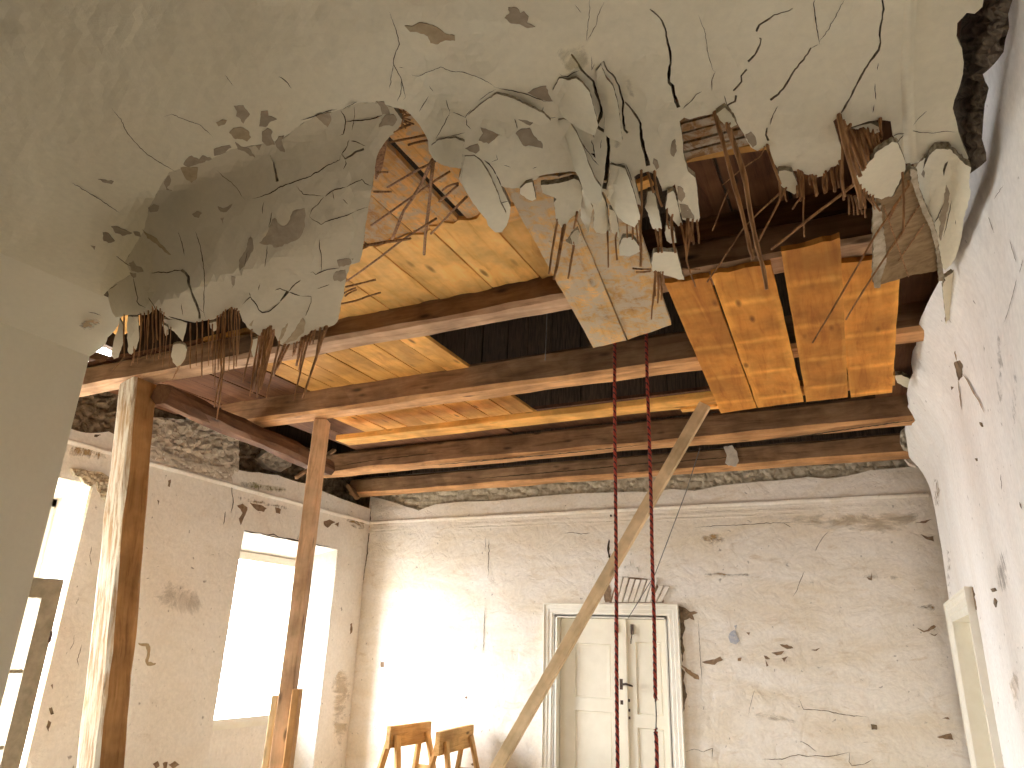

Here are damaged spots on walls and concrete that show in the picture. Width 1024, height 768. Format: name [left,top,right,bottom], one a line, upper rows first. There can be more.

crack [812,1,844,48]
crack [561,0,648,181]
crack [665,15,729,107]
flaking render [953,0,1012,173]
crack [116,114,176,172]
crack [220,14,555,314]
peeling [431,64,640,227]
flaking render [71,392,118,437]
flaking render [150,417,307,483]
flaking render [322,476,351,501]
flaking render [375,459,918,510]
crack [769,741,873,766]